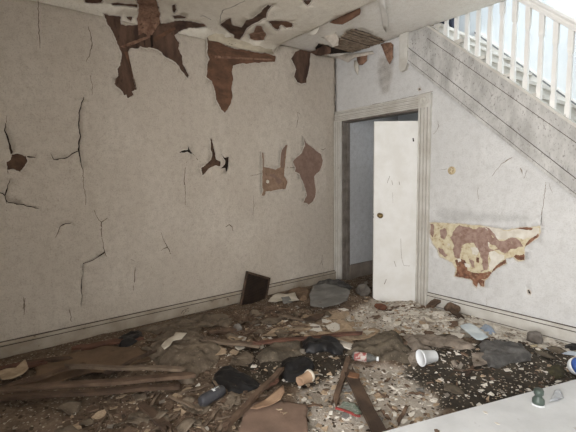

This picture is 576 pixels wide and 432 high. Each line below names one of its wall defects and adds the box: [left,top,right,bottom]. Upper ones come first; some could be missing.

flaking render [103,0,207,99]
flaking render [206,5,294,114]
flaking render [290,49,312,84]
crack [4,117,13,154]
spalling [5,152,29,173]
crack [1,170,38,211]
crack [51,76,107,301]
spalling [201,137,229,176]
flaking render [261,136,324,205]
flaking render [429,222,541,288]